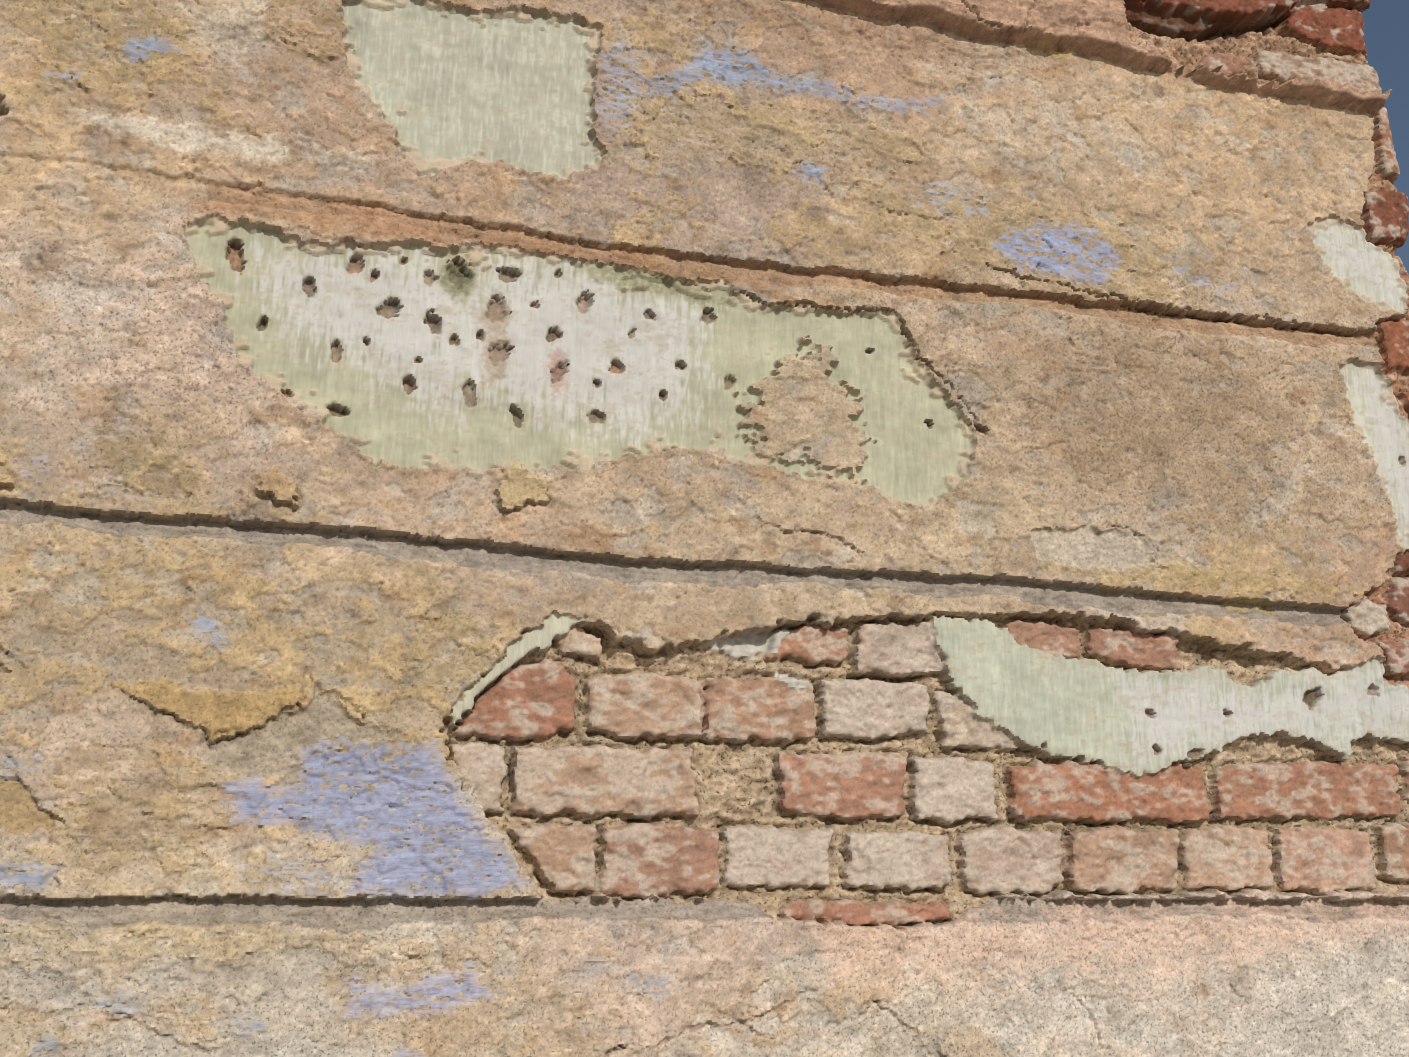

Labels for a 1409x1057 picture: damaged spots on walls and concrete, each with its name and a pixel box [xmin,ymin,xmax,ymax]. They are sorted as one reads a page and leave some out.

flaking render [0,94,9,117]
peeling [342,0,608,181]
peeling [185,213,990,510]
flaking render [440,0,1409,929]
peeling [0,775,66,835]
crack [605,984,825,1057]
crack [858,994,943,1057]
peeling [940,1023,1009,1057]
crack [1048,986,1113,1057]